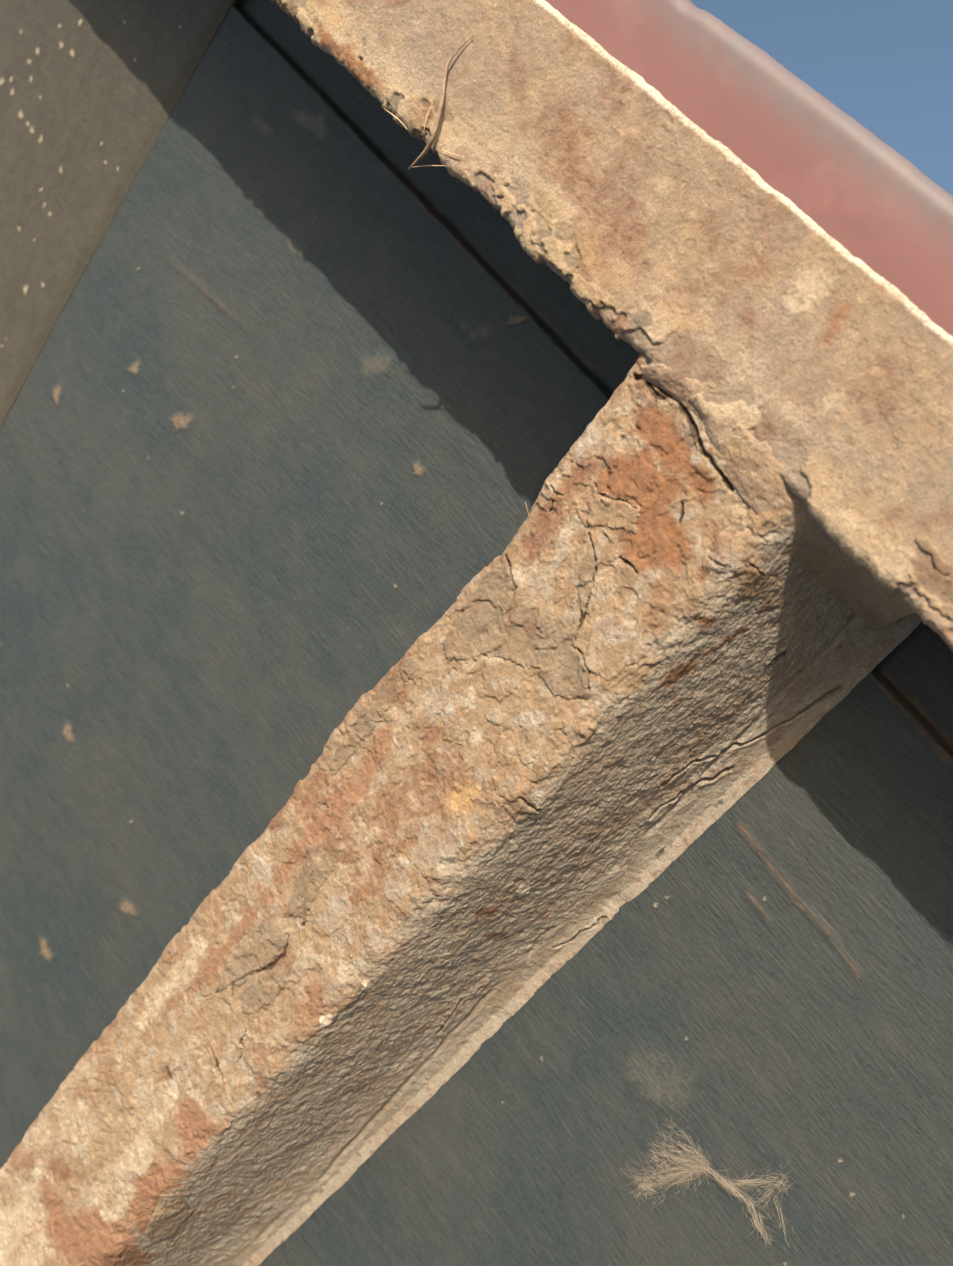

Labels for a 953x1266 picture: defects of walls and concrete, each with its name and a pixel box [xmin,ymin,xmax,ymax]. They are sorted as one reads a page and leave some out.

peeling [271,0,318,47]
peeling [381,86,429,141]
peeling [530,224,608,309]
crack [630,371,735,493]
corrosion [512,384,725,584]
crack [678,500,686,525]
crack [576,530,638,692]
peeling [908,536,953,620]
crack [644,681,847,823]
crack [228,919,306,999]
crack [209,1028,247,1080]
corrosion [38,1087,234,1266]